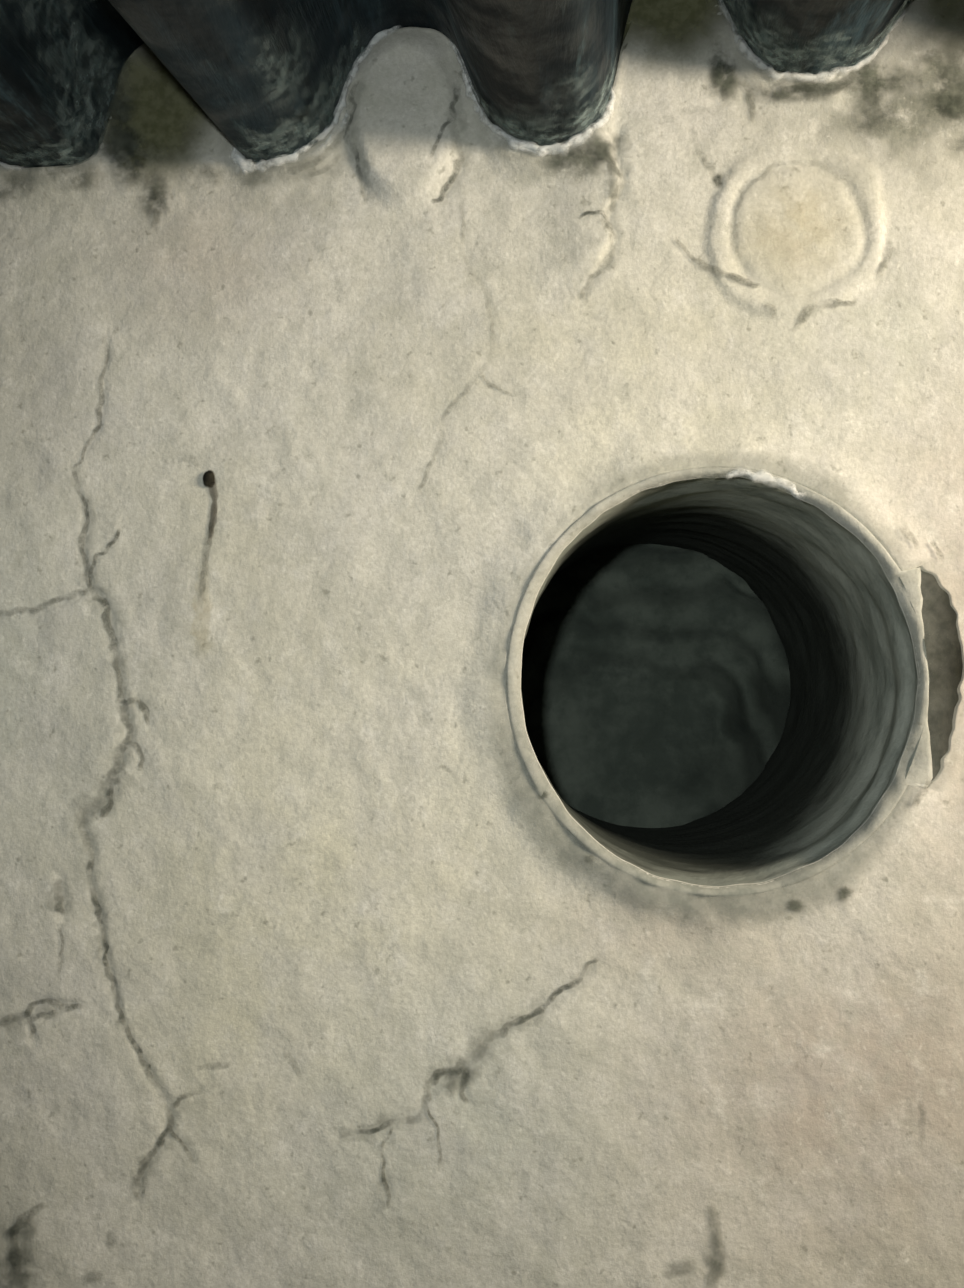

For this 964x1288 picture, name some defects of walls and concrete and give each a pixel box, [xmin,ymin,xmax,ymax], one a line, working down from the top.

leakage [712,57,737,95]
leakage [775,83,829,98]
leakage [857,62,898,126]
leakage [553,138,613,171]
crack [55,531,120,633]
spalling [918,567,963,780]
crack [88,863,109,967]
crack [521,984,571,1021]
crack [433,1070,467,1100]
crack [154,1101,181,1151]